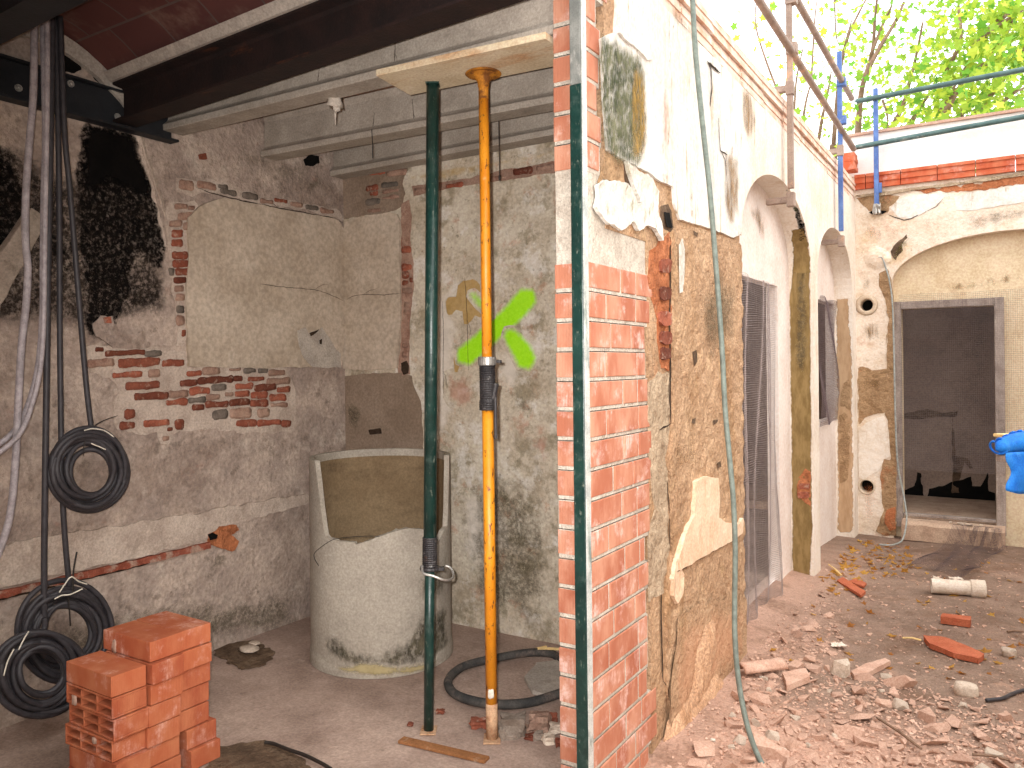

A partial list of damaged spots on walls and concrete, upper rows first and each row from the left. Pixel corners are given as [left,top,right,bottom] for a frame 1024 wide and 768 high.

flaking render [86,168,426,444]
crack [264,284,399,300]
flaking render [439,161,555,191]
water stain [600,38,646,163]
peeling [593,153,674,371]
spalling [837,234,907,536]